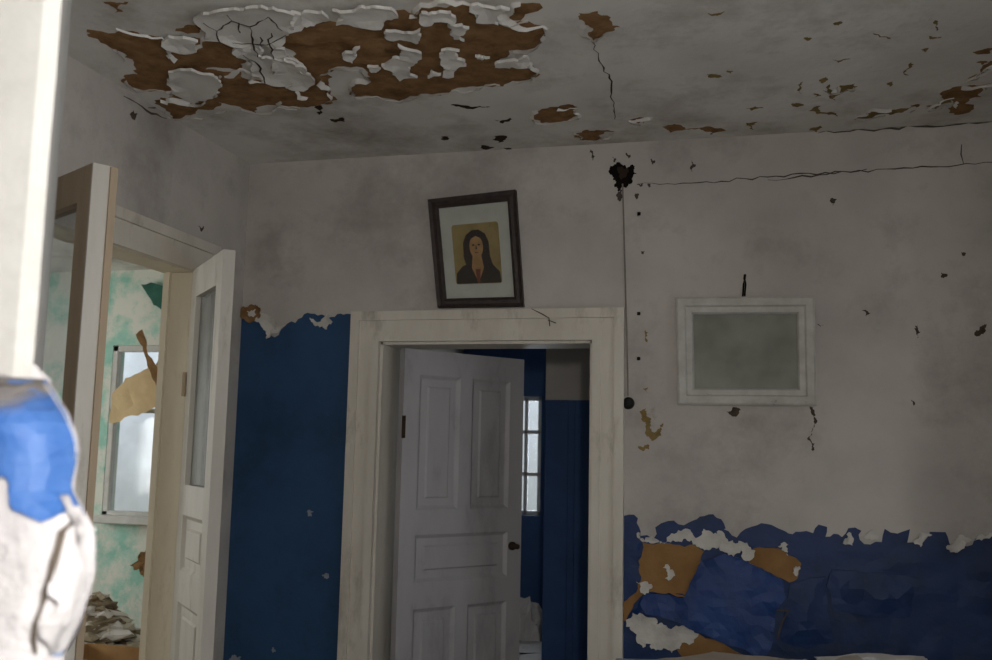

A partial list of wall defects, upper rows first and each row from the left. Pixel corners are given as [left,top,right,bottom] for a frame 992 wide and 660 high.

peeling [86,0,549,122]
peeling [577,11,619,43]
crack [591,41,616,119]
peeling [853,48,992,121]
peeling [481,118,512,150]
peeling [529,104,614,143]
peeling [664,124,726,135]
crack [637,122,992,185]
peeling [0,379,90,656]
peeling [623,529,801,657]